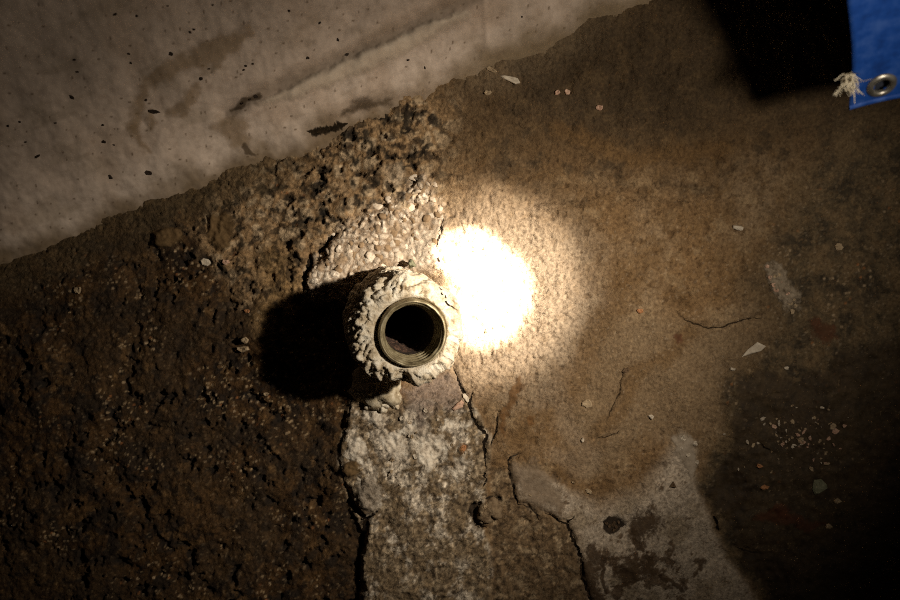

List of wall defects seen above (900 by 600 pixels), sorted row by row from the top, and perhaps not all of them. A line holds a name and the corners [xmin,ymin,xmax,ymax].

spalling [311,174,447,300]
flaking render [236,337,250,353]
crack [681,316,767,329]
crack [337,398,378,600]
peeling [343,393,472,510]
crack [453,367,592,600]